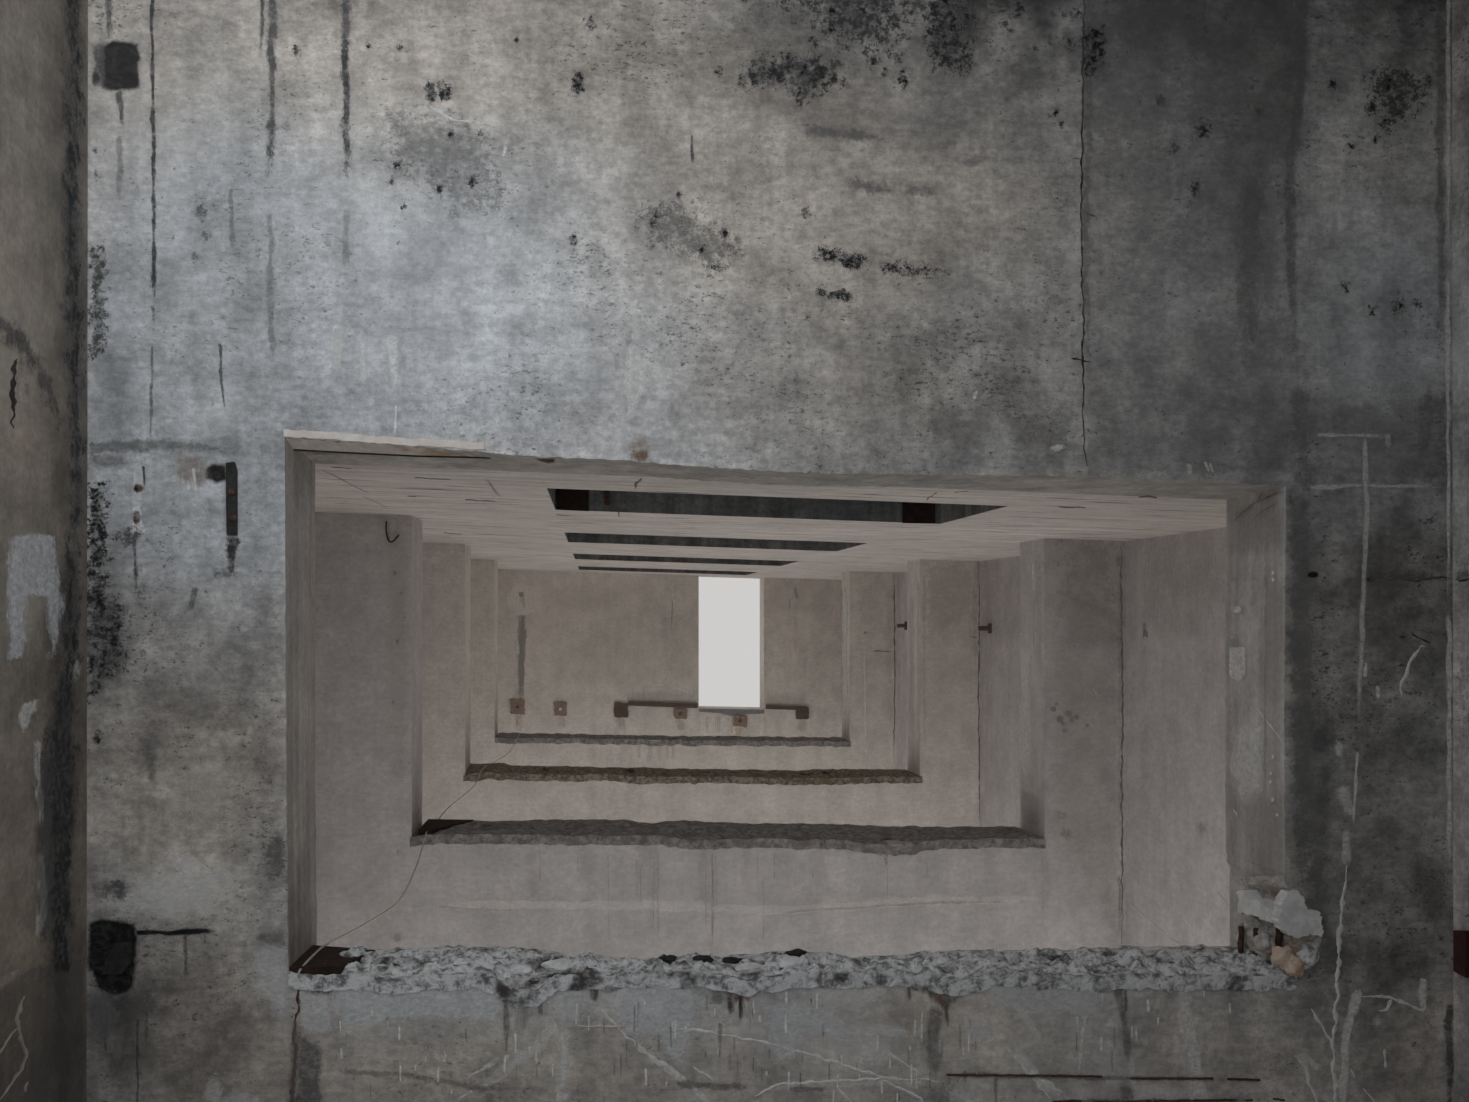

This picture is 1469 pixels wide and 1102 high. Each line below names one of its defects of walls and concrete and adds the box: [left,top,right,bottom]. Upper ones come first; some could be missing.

water stain [260,0,301,174]
water stain [340,0,372,177]
water stain [423,79,483,141]
water stain [807,127,878,141]
water stain [713,0,987,110]
water stain [635,191,744,277]
water stain [815,288,853,301]
water stain [815,246,950,280]
water stain [0,0,217,1102]
crack [1307,570,1319,578]
crack [1361,566,1469,639]
spalling [1236,875,1324,977]